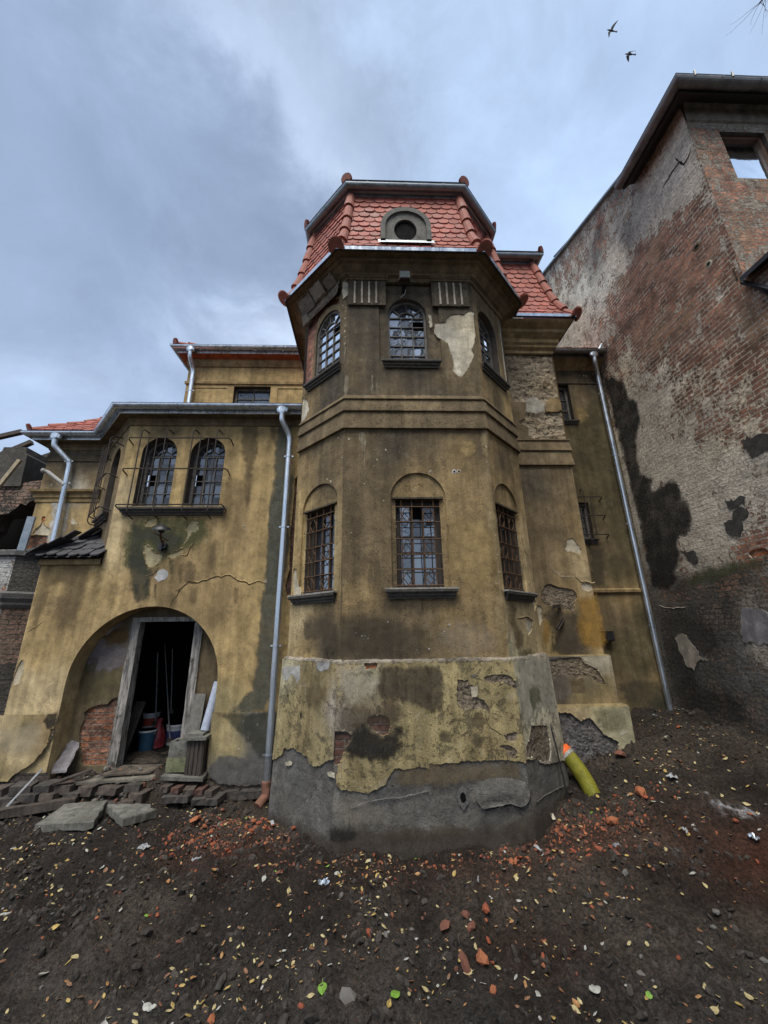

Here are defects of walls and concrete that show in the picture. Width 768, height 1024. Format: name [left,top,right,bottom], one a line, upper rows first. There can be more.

crack [662,151,691,189]
peeling [428,310,476,377]
peeling [499,322,566,439]
damp [605,377,691,589]
damp [129,557,156,601]
crack [146,543,266,606]
flaking render [526,567,593,635]
spalling [457,674,517,712]
flaking render [550,657,606,684]
flaking render [78,697,118,766]
flaking render [268,712,620,860]